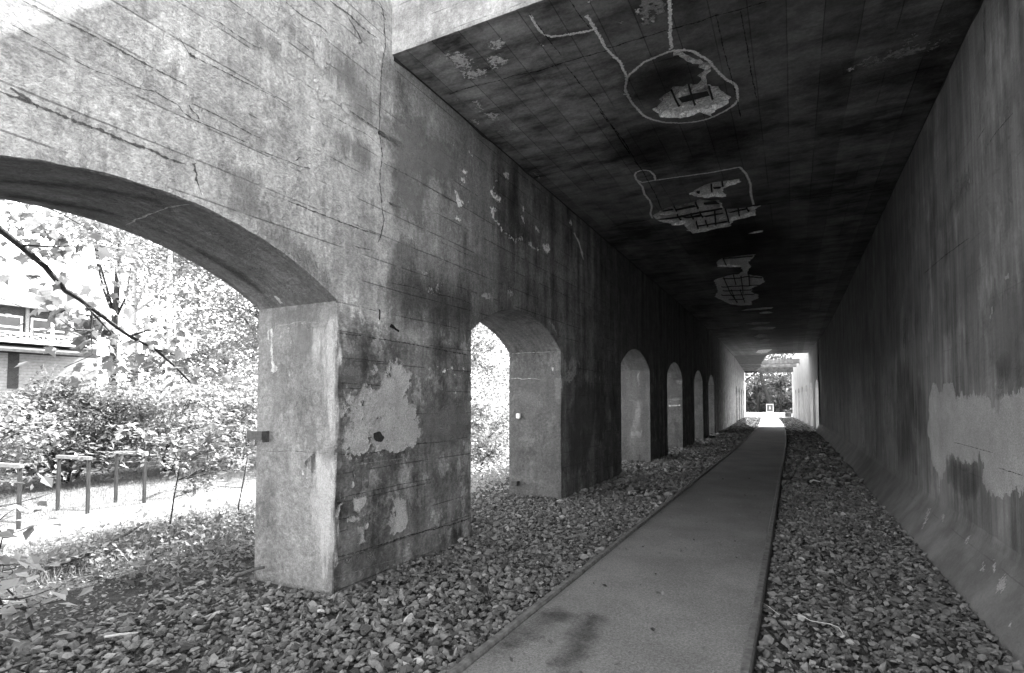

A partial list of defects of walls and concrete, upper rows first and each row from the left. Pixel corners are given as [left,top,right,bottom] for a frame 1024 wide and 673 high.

peeling [635,0,666,25]
peeling [421,38,508,79]
spalling [652,51,731,118]
crack [0,87,202,195]
crack [210,0,771,353]
peeling [490,170,550,253]
spalling [653,179,761,234]
spalling [714,254,776,330]
peeling [334,356,470,564]
peeling [927,382,1024,500]